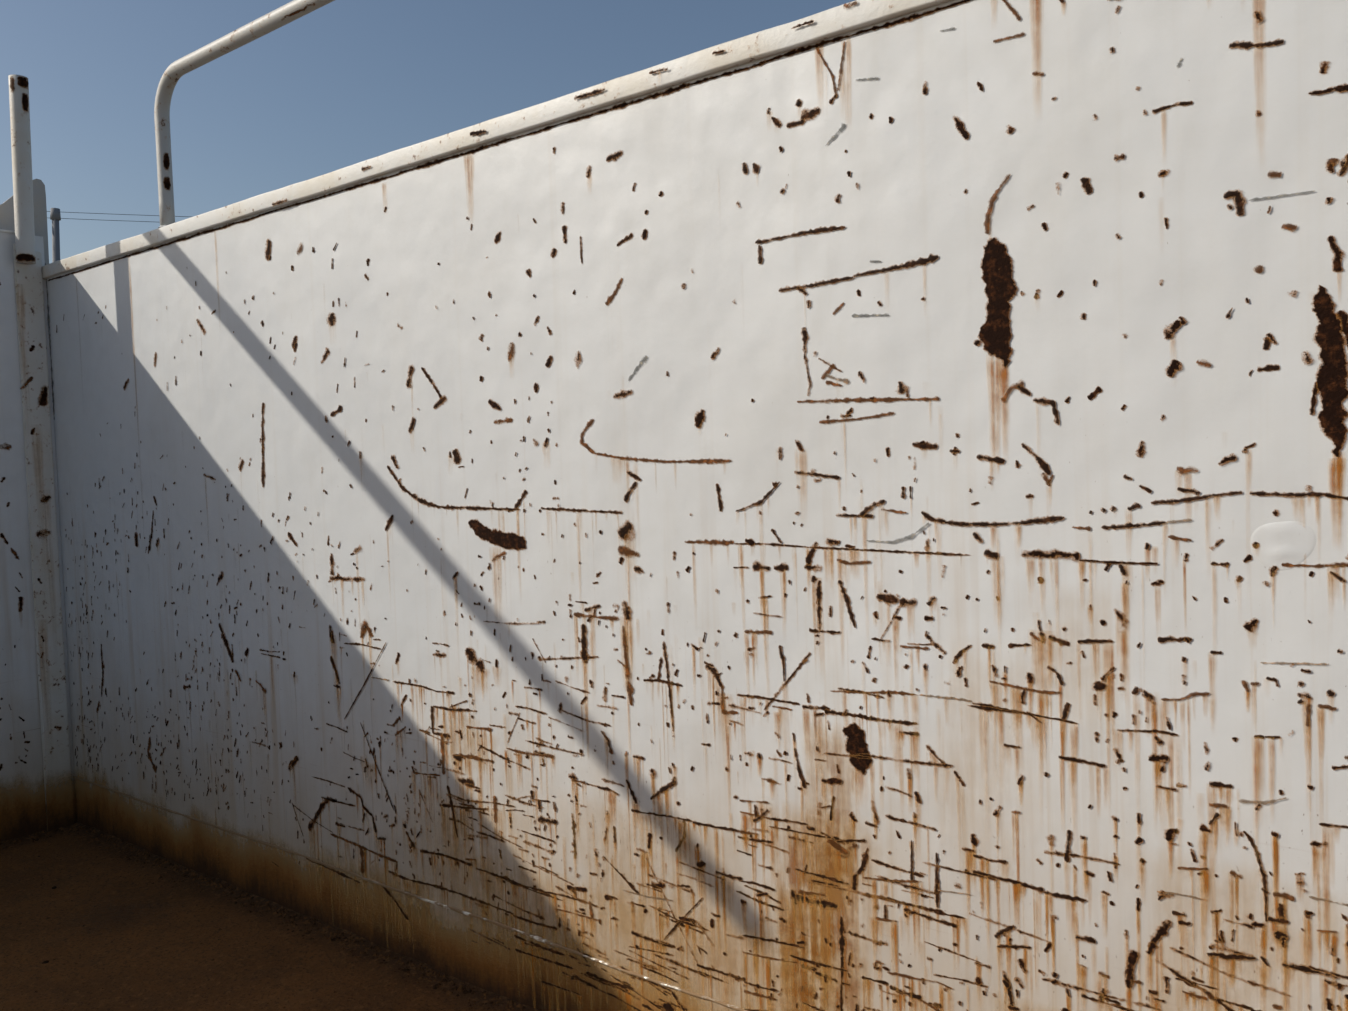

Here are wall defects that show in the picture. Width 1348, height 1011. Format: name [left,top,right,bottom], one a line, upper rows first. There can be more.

rust [16,0,970,420]
rust [1223,190,1246,216]
rust [1089,474,1152,514]
rust [733,542,832,645]
rust [860,590,946,669]
rust [973,528,999,601]
rust [981,620,1085,664]
rust [66,438,726,1011]
rust [1169,828,1218,893]
rust [733,798,1074,1011]
rust [1158,890,1191,926]
rust [1209,839,1313,978]